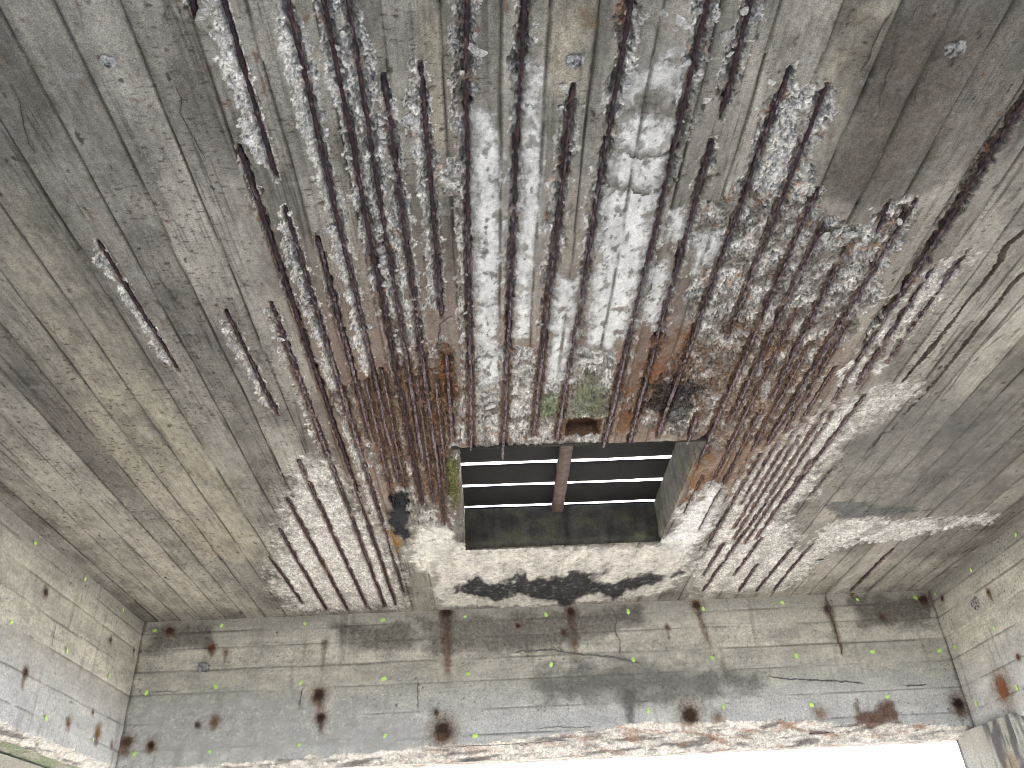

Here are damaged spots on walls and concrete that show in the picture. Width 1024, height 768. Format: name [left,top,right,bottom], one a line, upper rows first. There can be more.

spalling [92,238,184,374]
spalling [184,0,1024,615]
corrosion [357,343,460,497]
water stain [640,376,702,423]
water stain [332,479,721,655]
corrosion [438,610,452,671]
crack [769,596,864,684]
corrosion [313,688,325,731]
corrosion [433,709,453,746]
corrosion [855,700,899,726]
corrosion [994,674,1009,702]